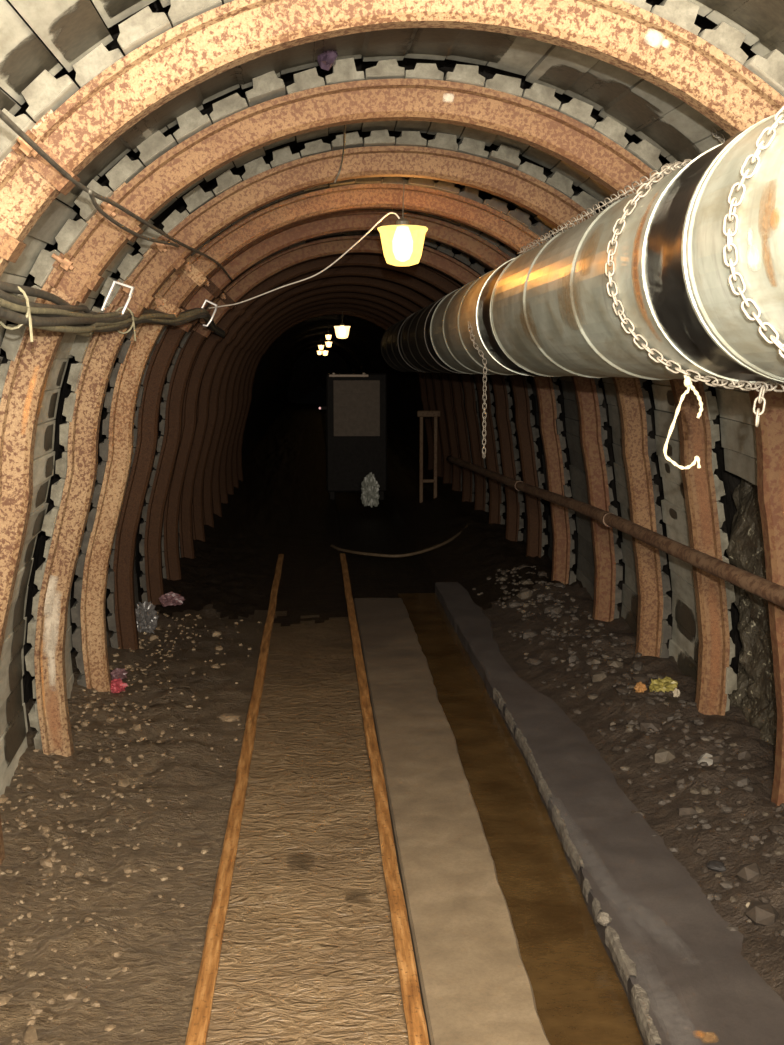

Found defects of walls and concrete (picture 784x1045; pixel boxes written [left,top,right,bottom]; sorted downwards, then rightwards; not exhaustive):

rust [760,188,779,286]
rust [23,377,46,422]